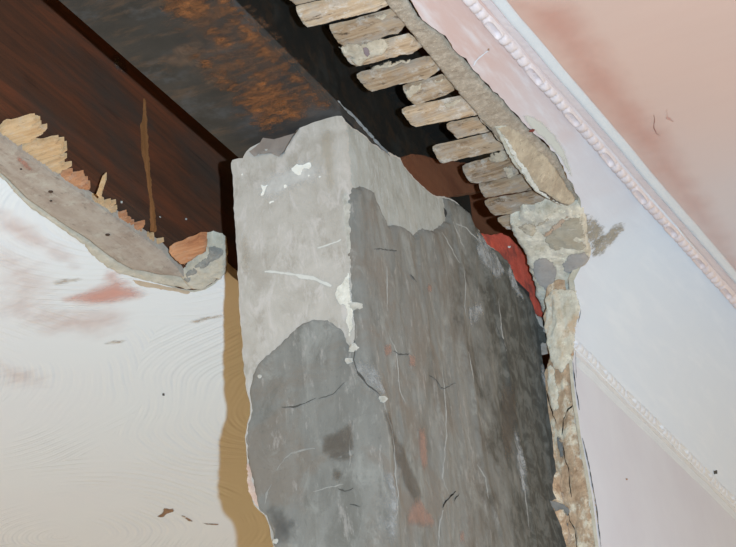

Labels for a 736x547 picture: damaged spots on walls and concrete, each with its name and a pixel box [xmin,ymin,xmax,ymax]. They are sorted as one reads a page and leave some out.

rust [239,73,300,125]
spalling [0,172,228,294]
spalling [342,193,351,258]
spalling [335,273,363,364]
spalling [385,0,598,547]
crack [283,351,379,408]
crack [546,353,580,547]